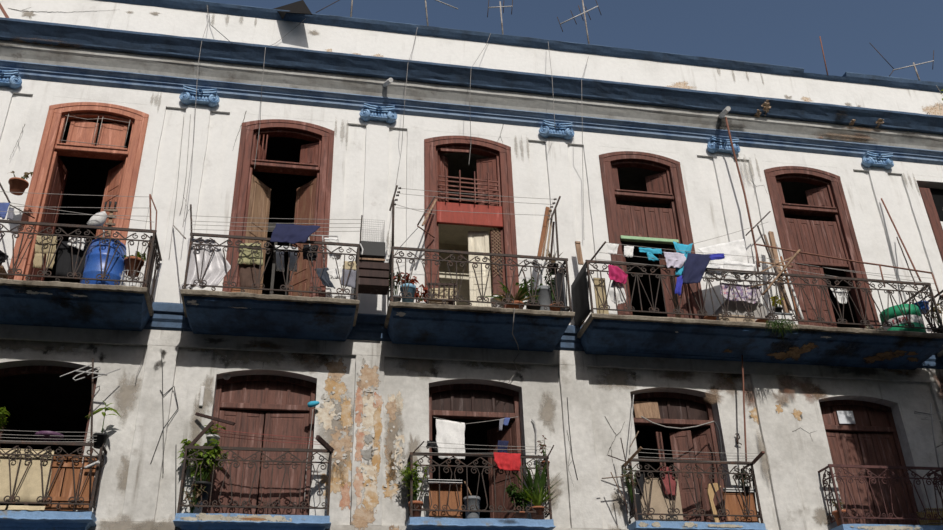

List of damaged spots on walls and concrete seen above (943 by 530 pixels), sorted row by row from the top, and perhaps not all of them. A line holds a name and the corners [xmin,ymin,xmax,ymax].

peeling [315,358,405,530]